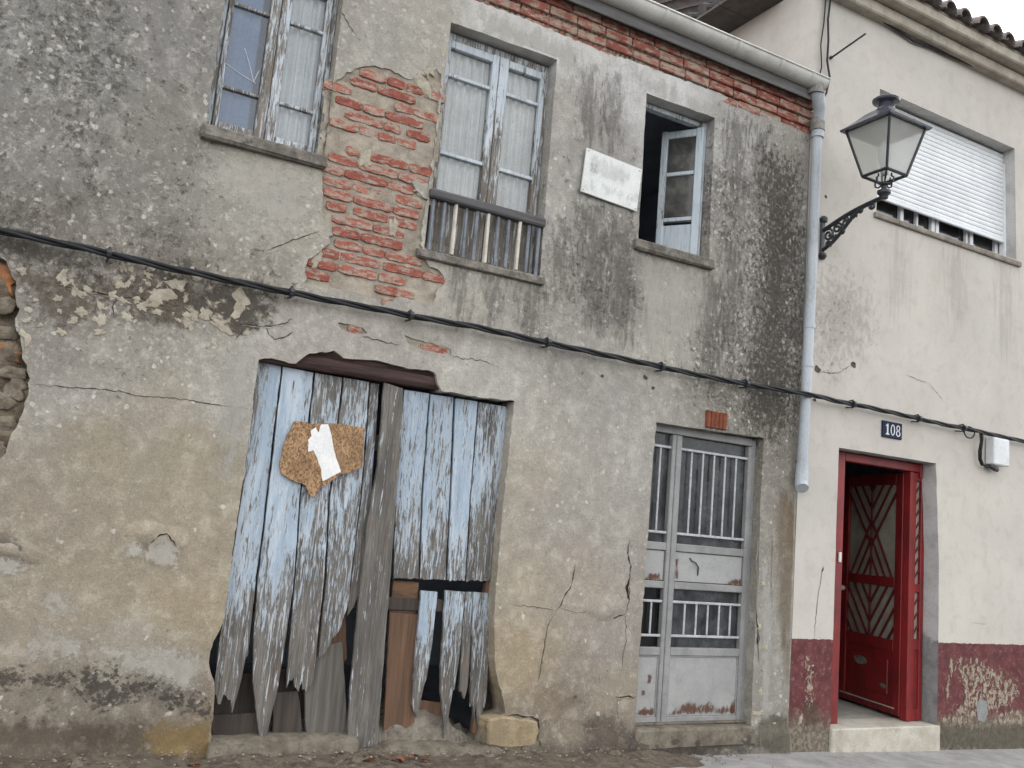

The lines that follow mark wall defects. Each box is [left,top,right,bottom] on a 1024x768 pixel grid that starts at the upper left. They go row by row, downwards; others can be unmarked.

flaking render [304,65,446,305]